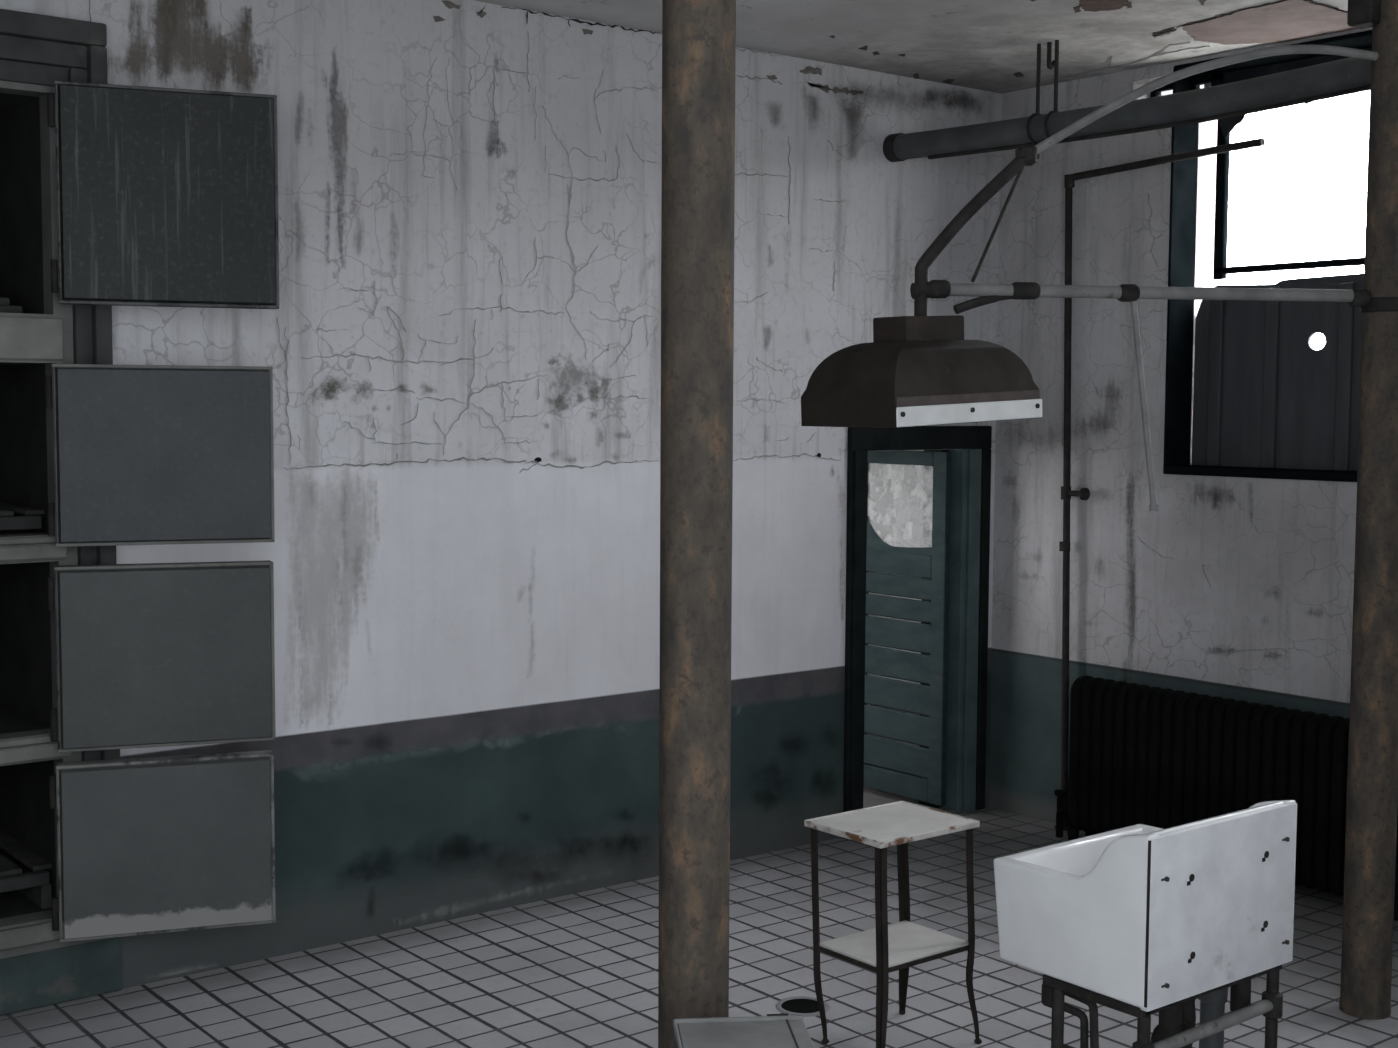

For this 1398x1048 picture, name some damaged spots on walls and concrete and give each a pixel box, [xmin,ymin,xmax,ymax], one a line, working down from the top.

water stain [124,0,257,88]
peeling [1073,0,1132,13]
flaking render [1153,0,1358,45]
water stain [327,59,347,254]
crack [277,6,659,471]
crack [735,137,842,291]
crack [735,432,834,461]